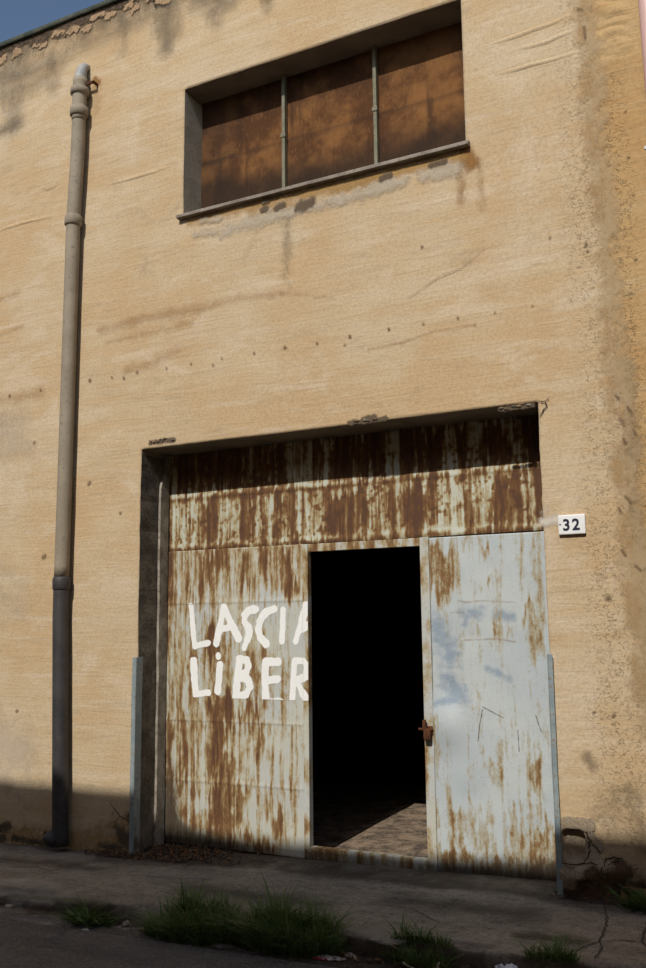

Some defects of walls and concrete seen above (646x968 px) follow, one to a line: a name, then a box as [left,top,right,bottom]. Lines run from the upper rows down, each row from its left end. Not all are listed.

spalling [0,0,171,65]
flaking render [194,158,460,238]
spalling [559,816,646,902]